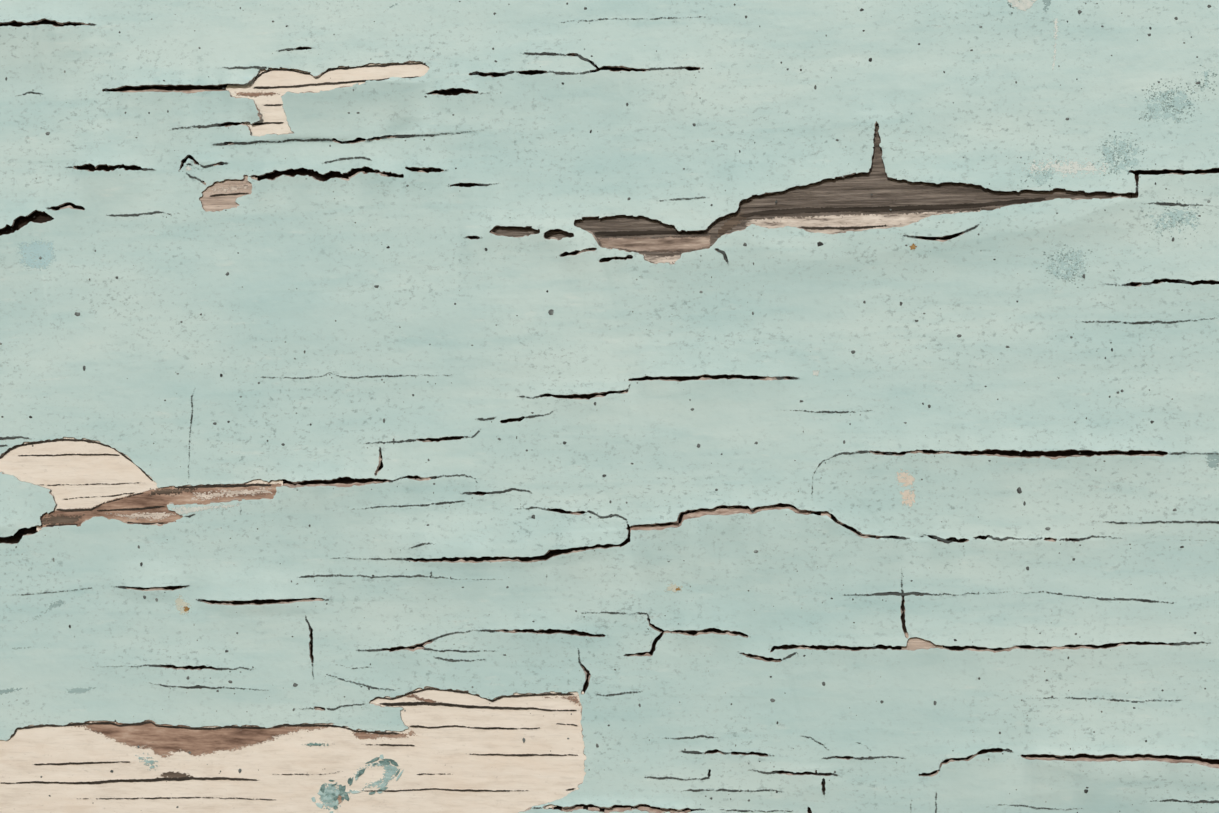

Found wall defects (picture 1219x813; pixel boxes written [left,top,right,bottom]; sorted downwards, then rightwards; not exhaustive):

peeling [226,61,429,137]
crack [426,52,703,96]
crack [0,203,170,236]
peeling [186,163,257,211]
peeling [492,123,1138,264]
crack [1129,169,1219,207]
crack [1110,278,1219,286]
crack [1076,317,1213,325]
peeling [0,437,283,531]
crack [18,375,1219,710]
peeling [0,687,586,813]
crack [533,735,1219,813]